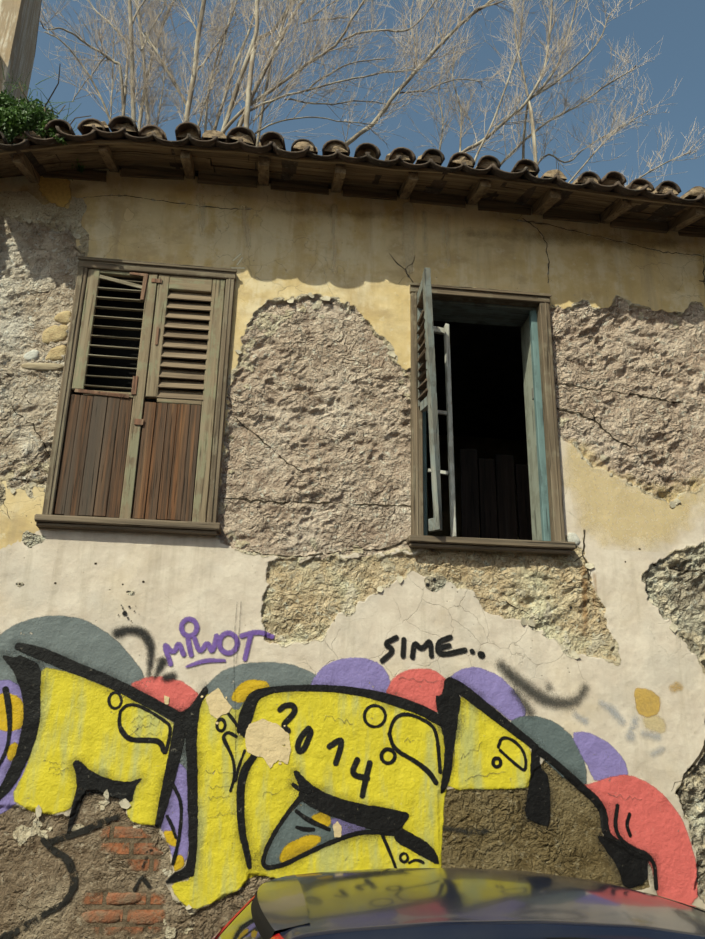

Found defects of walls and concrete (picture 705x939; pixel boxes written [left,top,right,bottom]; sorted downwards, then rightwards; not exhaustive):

crack [511,215,705,288]
crack [5,373,48,453]
flaking render [0,191,89,506]
crack [231,415,302,472]
crack [223,497,411,512]
crack [247,539,406,560]
flaking render [212,292,621,666]
flaking render [550,295,705,508]
crack [555,382,705,447]
flaking render [641,542,705,674]
flaking render [0,790,276,939]
flaking render [675,747,705,904]